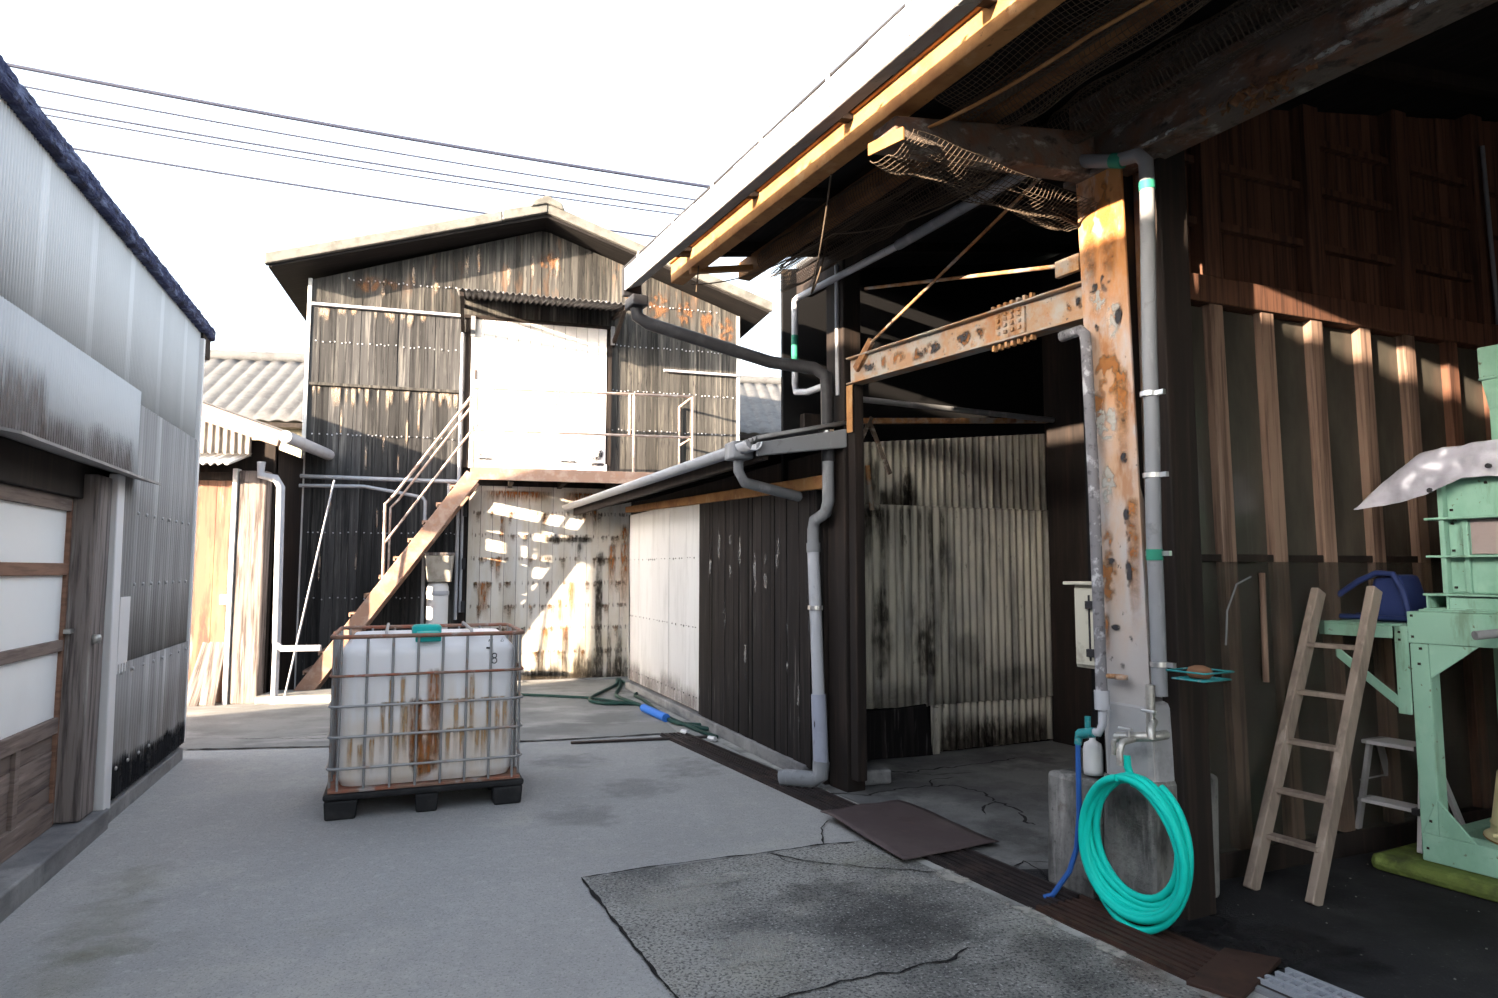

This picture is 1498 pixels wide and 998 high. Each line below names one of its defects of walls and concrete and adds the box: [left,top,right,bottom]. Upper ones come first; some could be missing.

corrosion [1082,183,1115,269]
corrosion [881,342,937,367]
corrosion [1095,355,1127,428]
water stain [864,462,944,588]
corrosion [470,491,628,657]
corrosion [1103,500,1138,637]
water stain [873,590,890,676]
water stain [918,616,935,676]
crack [581,757,1035,998]
crack [1014,860,1048,879]